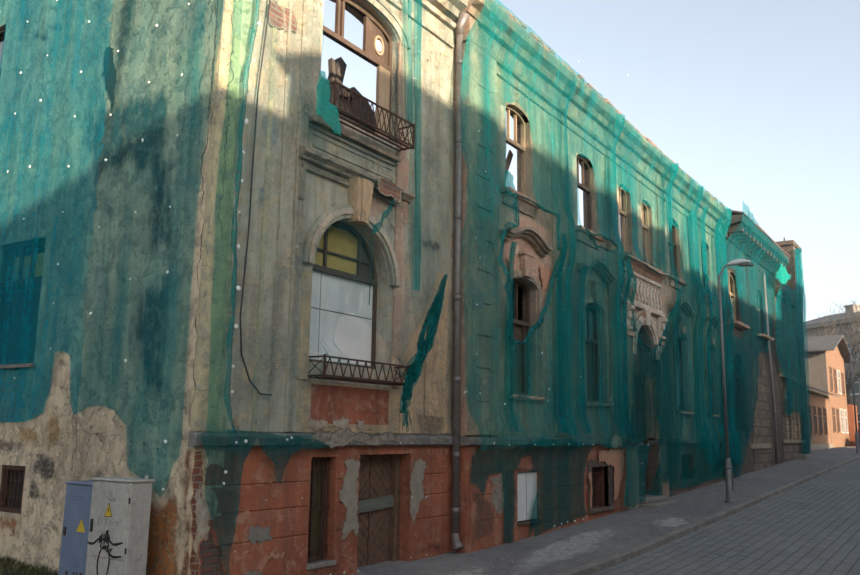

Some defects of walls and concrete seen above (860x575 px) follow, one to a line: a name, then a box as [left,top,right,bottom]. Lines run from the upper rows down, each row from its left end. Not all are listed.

spalling [266,1,298,33]
damp [94,0,171,245]
crack [189,0,235,416]
damp [136,289,166,394]
spalling [188,450,263,575]
peeling [339,459,361,544]
spalling [300,402,403,449]
peeling [410,458,427,528]
peeling [588,435,624,508]
flaking render [752,360,773,472]